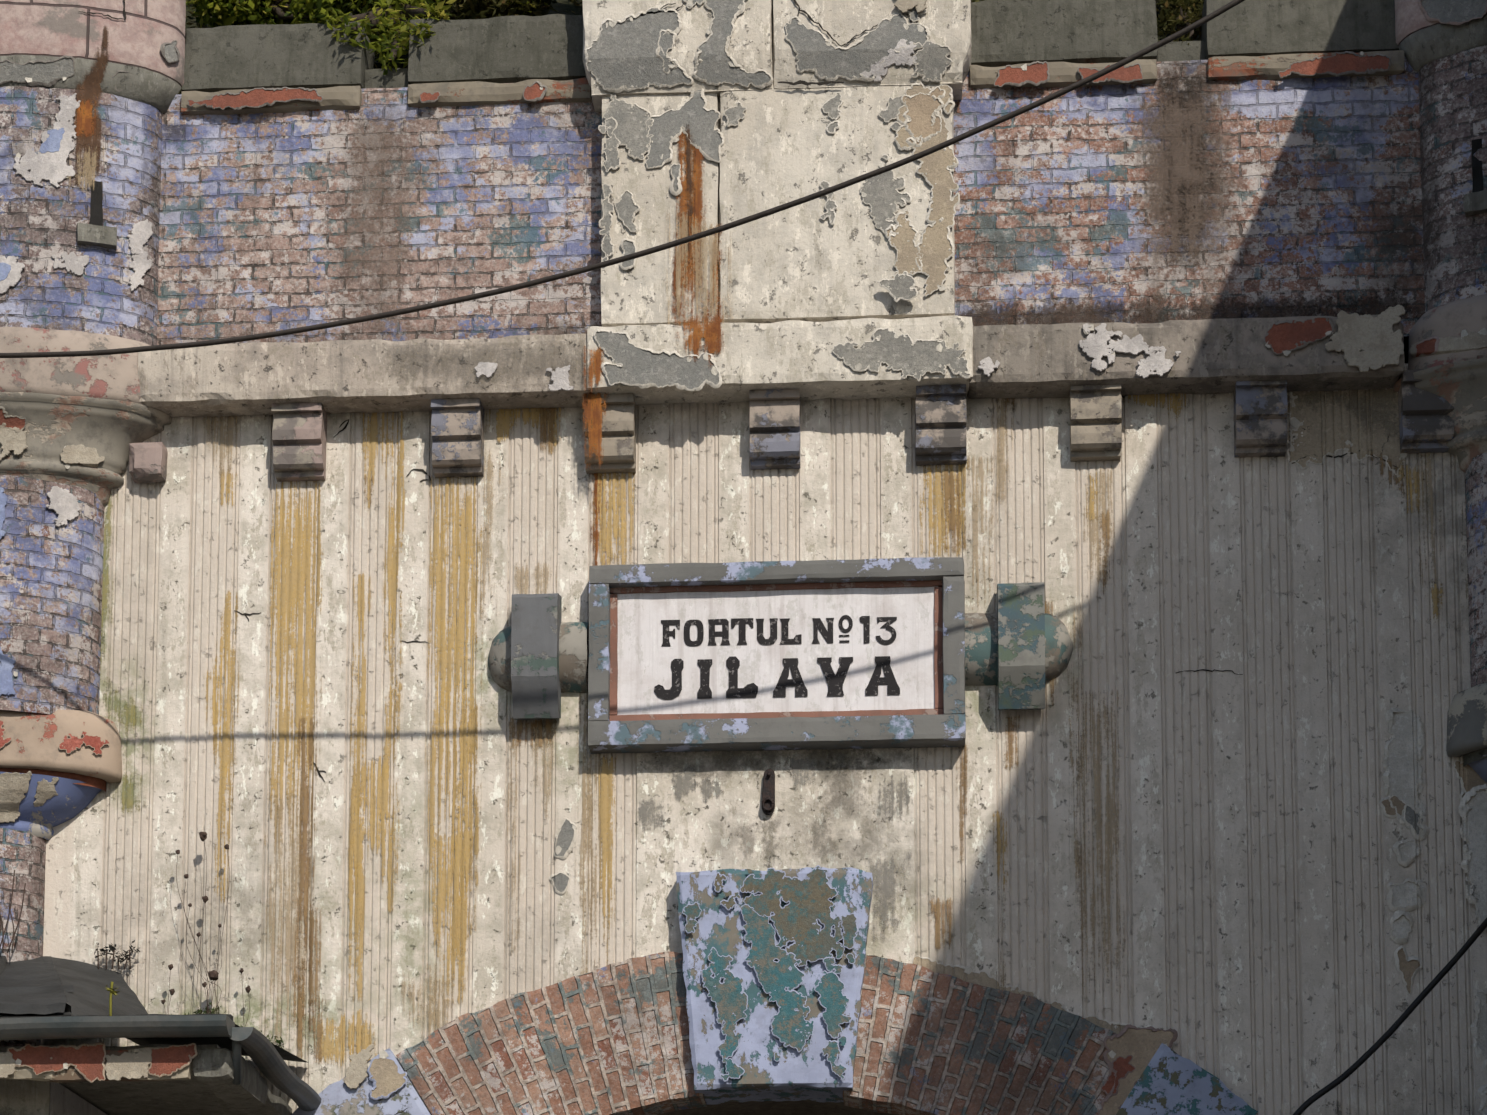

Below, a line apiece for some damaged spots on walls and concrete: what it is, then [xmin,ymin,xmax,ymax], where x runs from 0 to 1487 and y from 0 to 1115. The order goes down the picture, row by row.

rust [69,26,109,190]
spalling [585,0,773,270]
rust [667,125,731,362]
flaking render [785,7,960,302]
leakage [1144,71,1222,281]
spalling [593,329,722,391]
peeling [832,328,972,381]
peeling [0,649,18,696]
peeling [0,771,59,823]
peeling [701,865,858,1082]
peeling [0,1042,197,1083]
spalling [344,1044,407,1100]